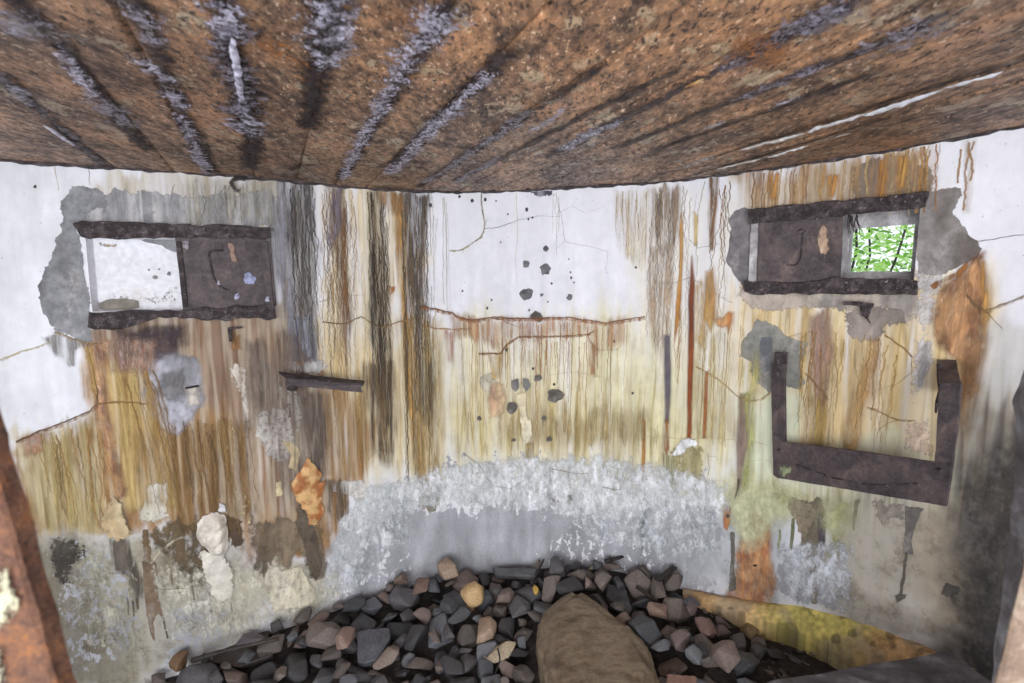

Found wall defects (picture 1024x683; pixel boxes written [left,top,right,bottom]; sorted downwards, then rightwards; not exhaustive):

corrosion [746,144,938,214]
corrosion [957,141,975,211]
crack [449,193,608,275]
corrosion [818,226,829,255]
crack [319,295,645,361]
corrosion [674,214,732,439]
peeling [757,337,773,372]
corrosion [931,253,988,424]
leakage [38,179,447,641]
corrosion [726,515,776,602]
leakage [894,506,923,602]
leakage [952,440,1016,681]